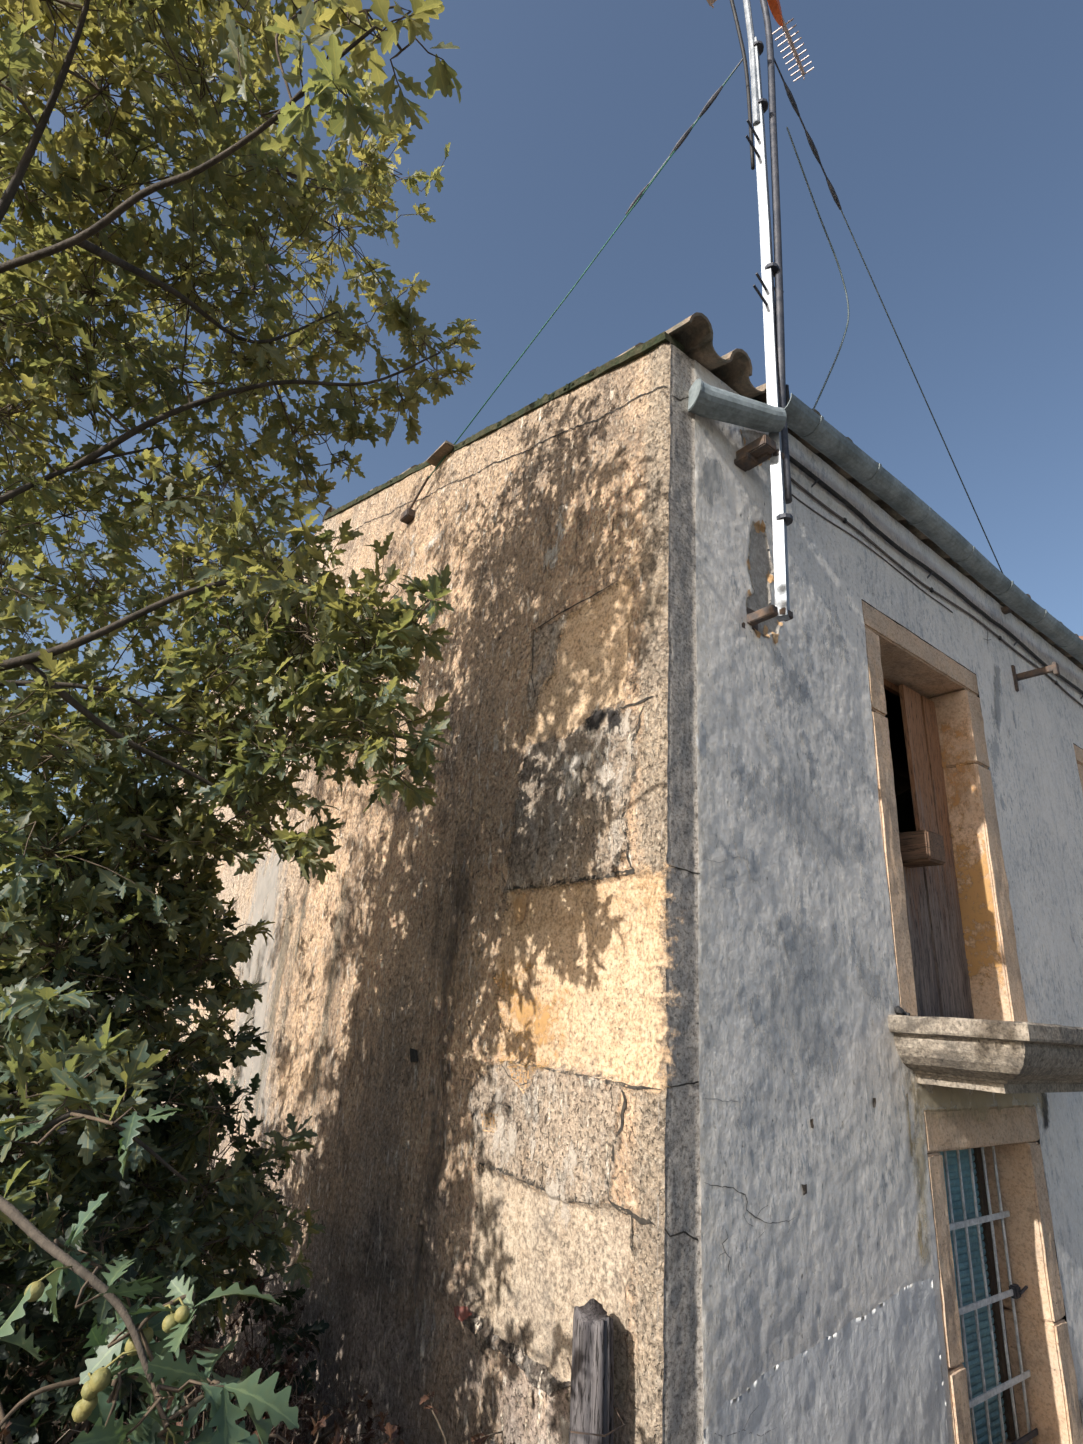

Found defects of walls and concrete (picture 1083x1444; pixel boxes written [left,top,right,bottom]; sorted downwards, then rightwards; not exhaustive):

flaking render [746,520,849,713]
peeling [692,722,708,759]
peeling [723,724,876,901]
crack [470,1061,794,1275]